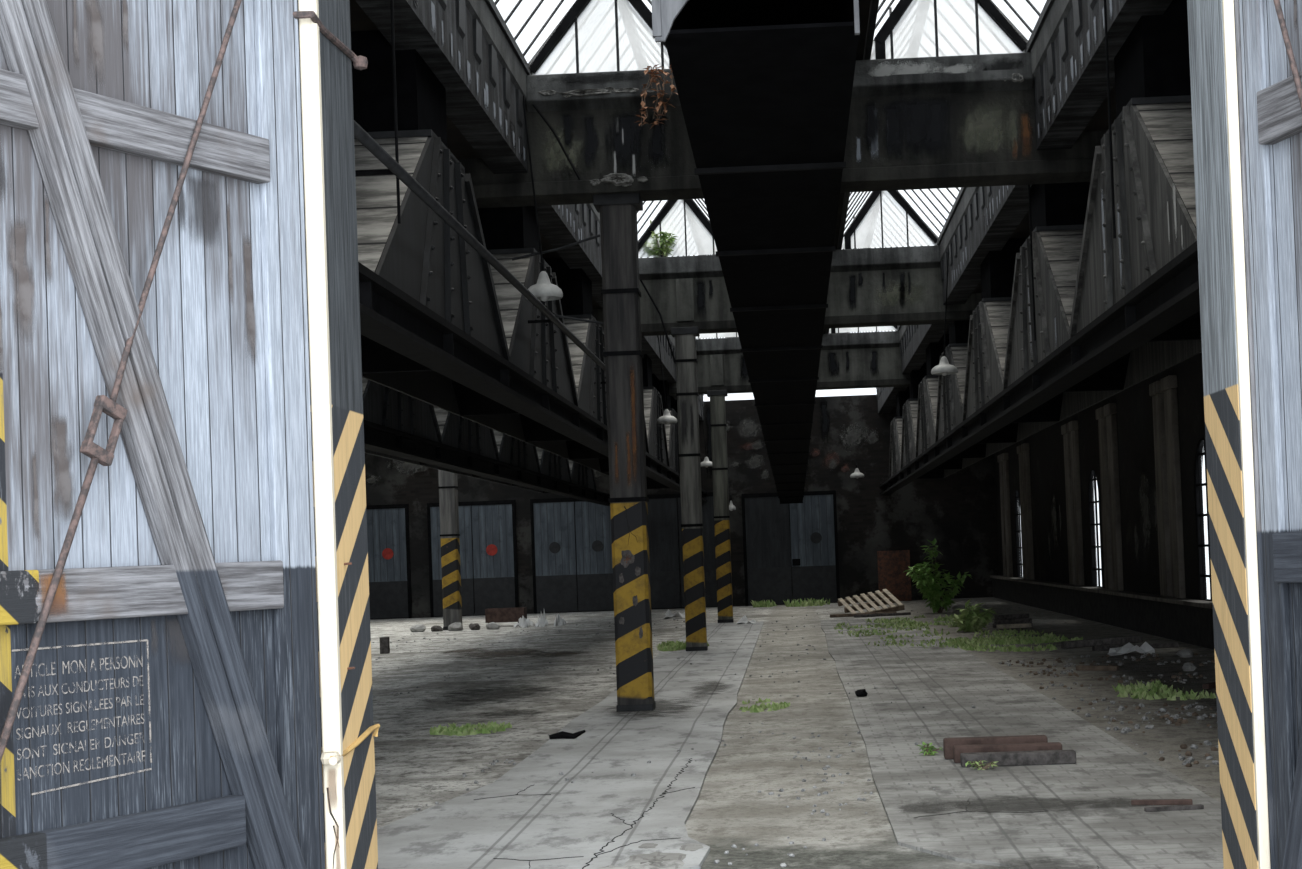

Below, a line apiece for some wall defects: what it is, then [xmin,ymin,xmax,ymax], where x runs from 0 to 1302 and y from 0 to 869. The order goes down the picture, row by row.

corrosion [42,575,66,612]
crack [493,758,695,869]